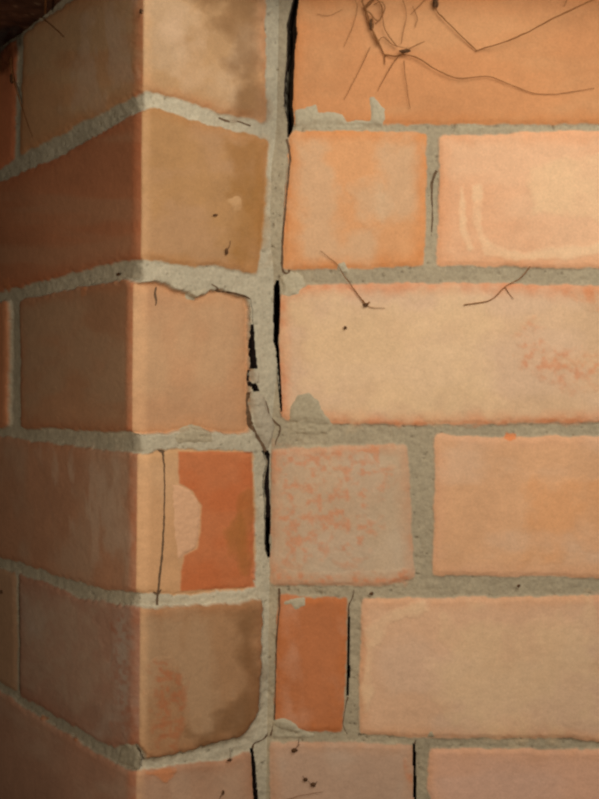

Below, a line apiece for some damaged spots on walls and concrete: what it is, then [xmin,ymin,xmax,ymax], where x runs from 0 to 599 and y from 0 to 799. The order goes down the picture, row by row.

crack [211,0,299,557]
crack [153,449,165,605]
peeling [172,450,262,592]
crack [250,588,281,799]
crack [343,590,354,733]
crack [410,740,418,799]